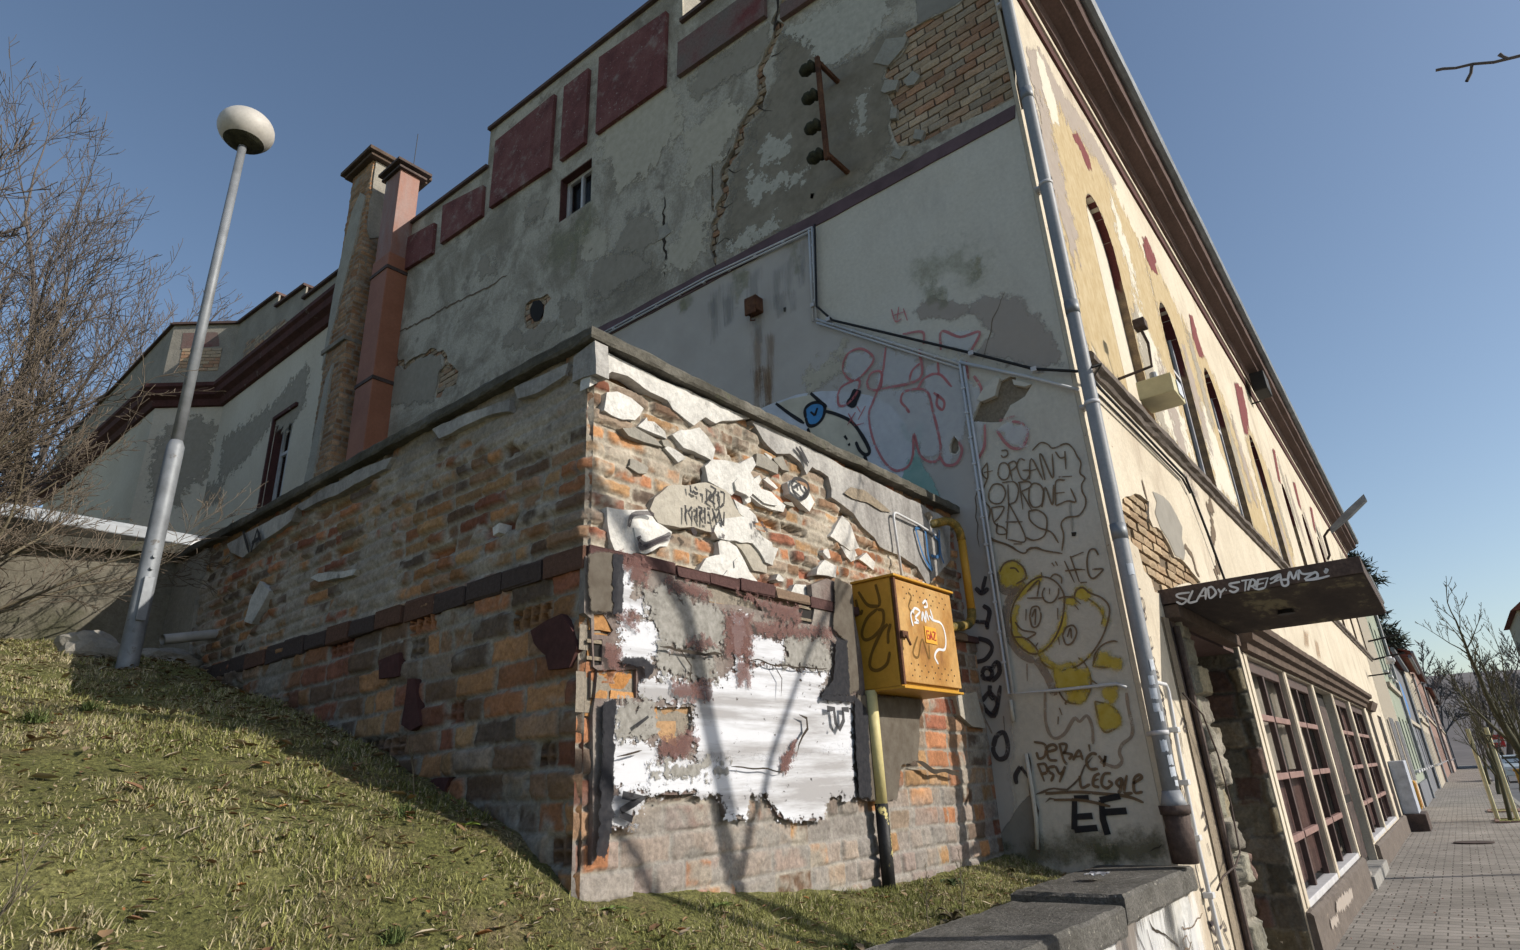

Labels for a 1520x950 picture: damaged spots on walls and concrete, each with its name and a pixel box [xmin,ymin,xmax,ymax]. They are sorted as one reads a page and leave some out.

crack [712,0,786,264]
flaking render [525,295,582,332]
crack [658,197,671,275]
peeling [596,0,1344,568]
peeling [391,354,458,408]
flaking render [1122,492,1197,593]
peeling [430,341,950,861]
flaking render [950,692,986,729]
peeling [1358,617,1399,761]
peeling [1001,795,1035,858]